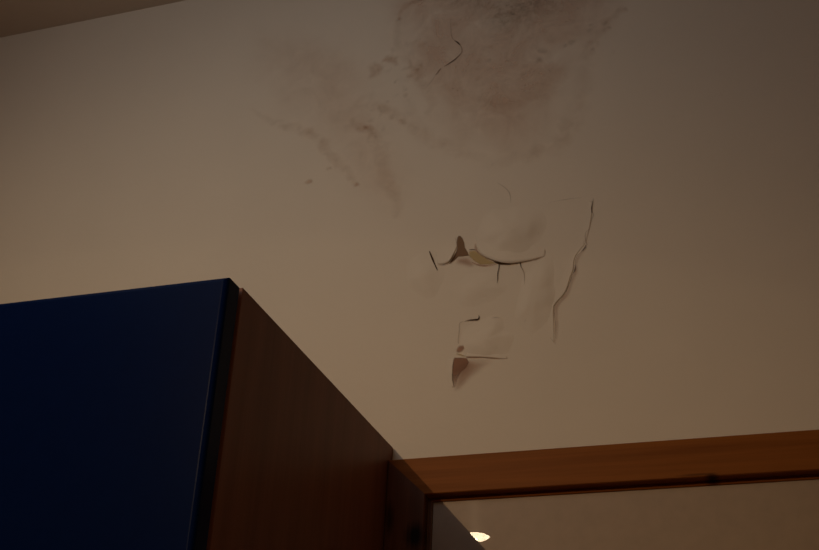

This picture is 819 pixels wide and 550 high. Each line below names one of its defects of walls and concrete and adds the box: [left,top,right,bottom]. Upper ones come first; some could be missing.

peeling [436,236,546,266]
peeling [446,346,507,388]